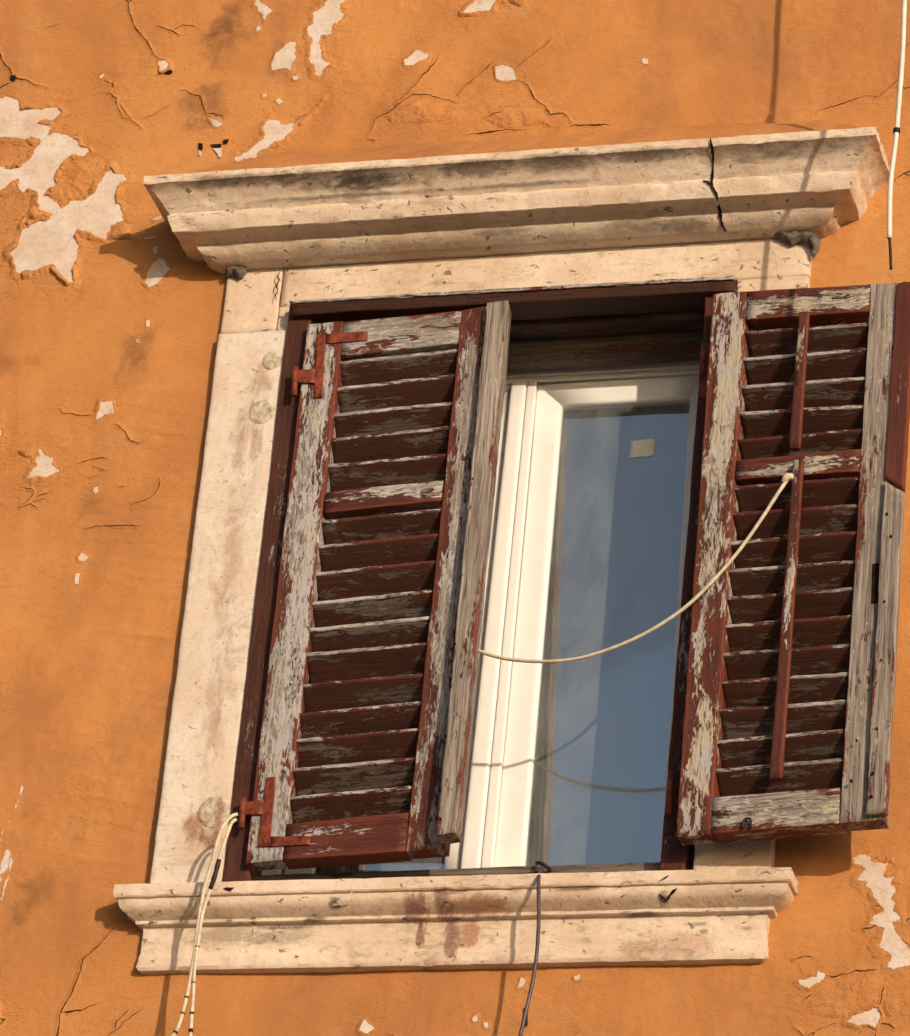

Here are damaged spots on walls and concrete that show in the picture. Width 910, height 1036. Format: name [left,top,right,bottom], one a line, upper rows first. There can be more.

crack [124,0,198,61]
peeling [268,0,353,82]
peeling [458,0,509,18]
crack [100,87,225,131]
peeling [198,92,299,163]
crack [363,36,611,144]
peeling [0,75,136,290]
crack [703,138,726,232]
peeling [846,845,910,978]
crack [52,916,147,1036]
crack [790,952,897,1036]
peeling [840,1004,886,1031]